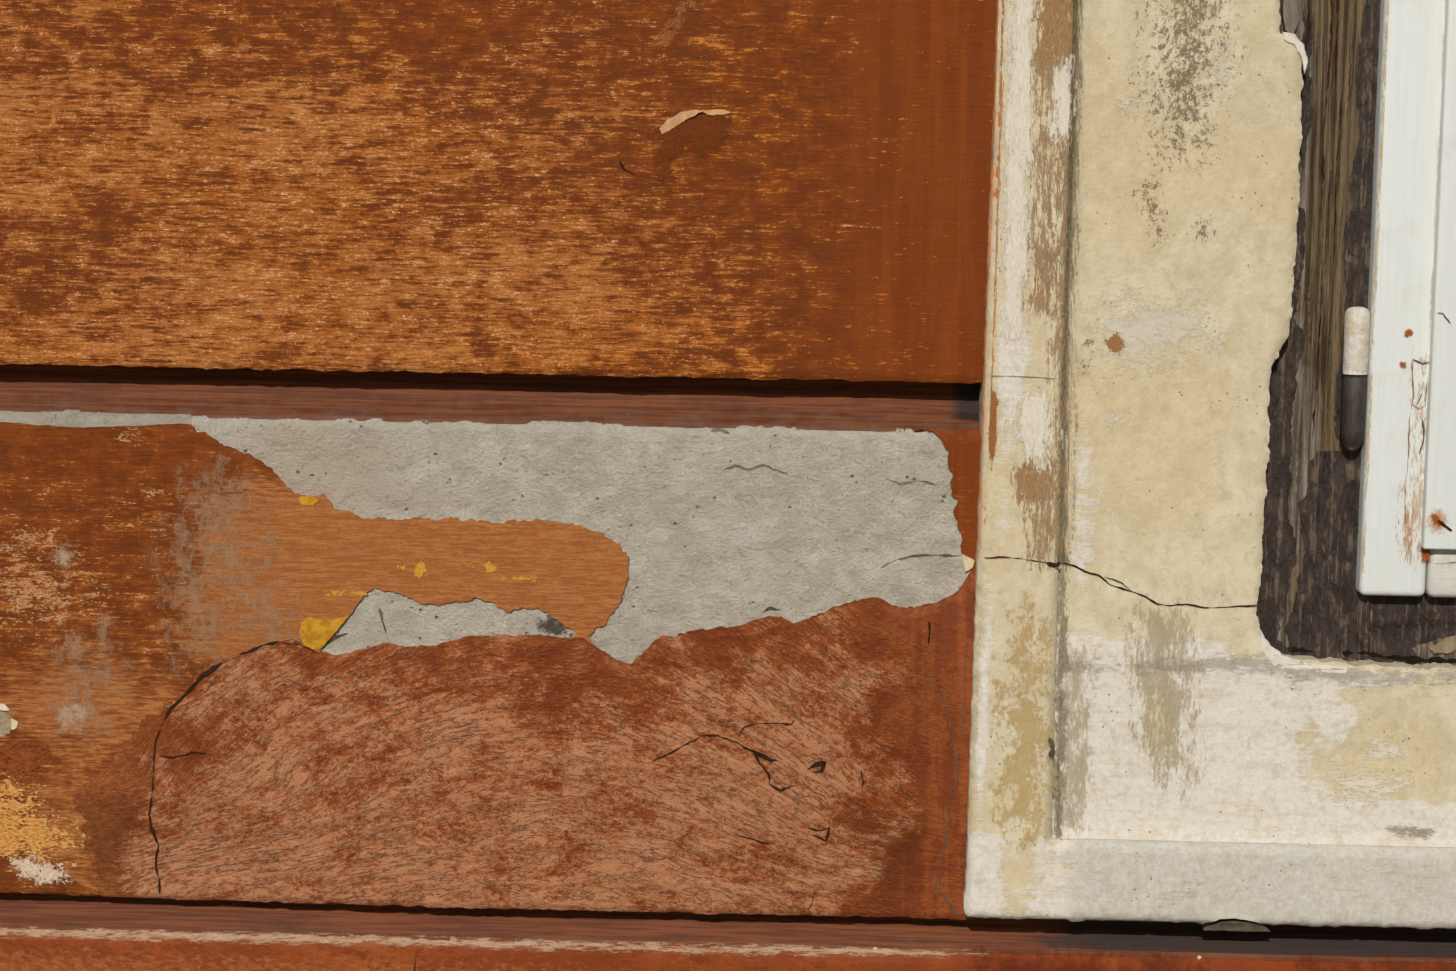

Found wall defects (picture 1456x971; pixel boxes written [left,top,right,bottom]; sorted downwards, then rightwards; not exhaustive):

peeling [1282,0,1315,176]
peeling [1343,0,1381,312]
peeling [1010,0,1124,572]
spalling [0,410,975,664]
crack [984,556,1263,608]
peeling [1256,207,1456,674]
corrosion [1418,546,1431,563]
corrosion [1430,511,1452,531]
peeling [0,703,100,894]
crack [148,641,314,894]
crack [652,720,826,791]
crack [808,827,830,841]